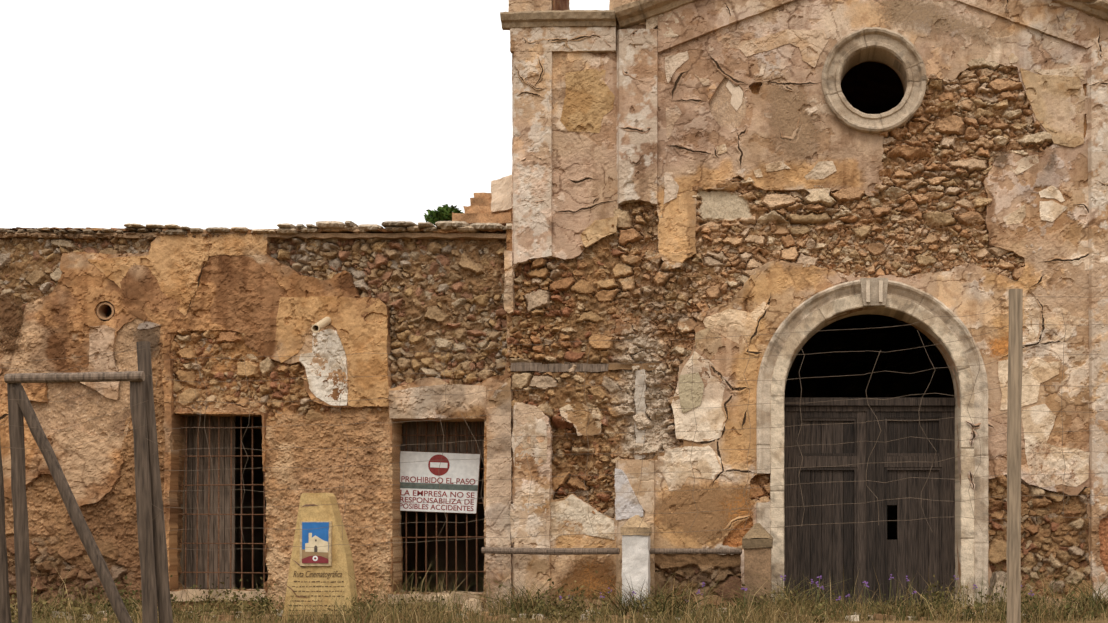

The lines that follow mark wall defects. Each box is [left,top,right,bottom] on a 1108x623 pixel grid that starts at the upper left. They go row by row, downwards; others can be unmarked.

crack [515,29,821,144]
peeling [665,51,689,83]
crack [619,125,747,168]
peeling [0,233,268,337]
spalling [169,58,1089,607]
peeling [87,318,166,510]
spalling [4,497,17,606]
spalling [26,381,142,608]
spalling [1021,357,1108,601]